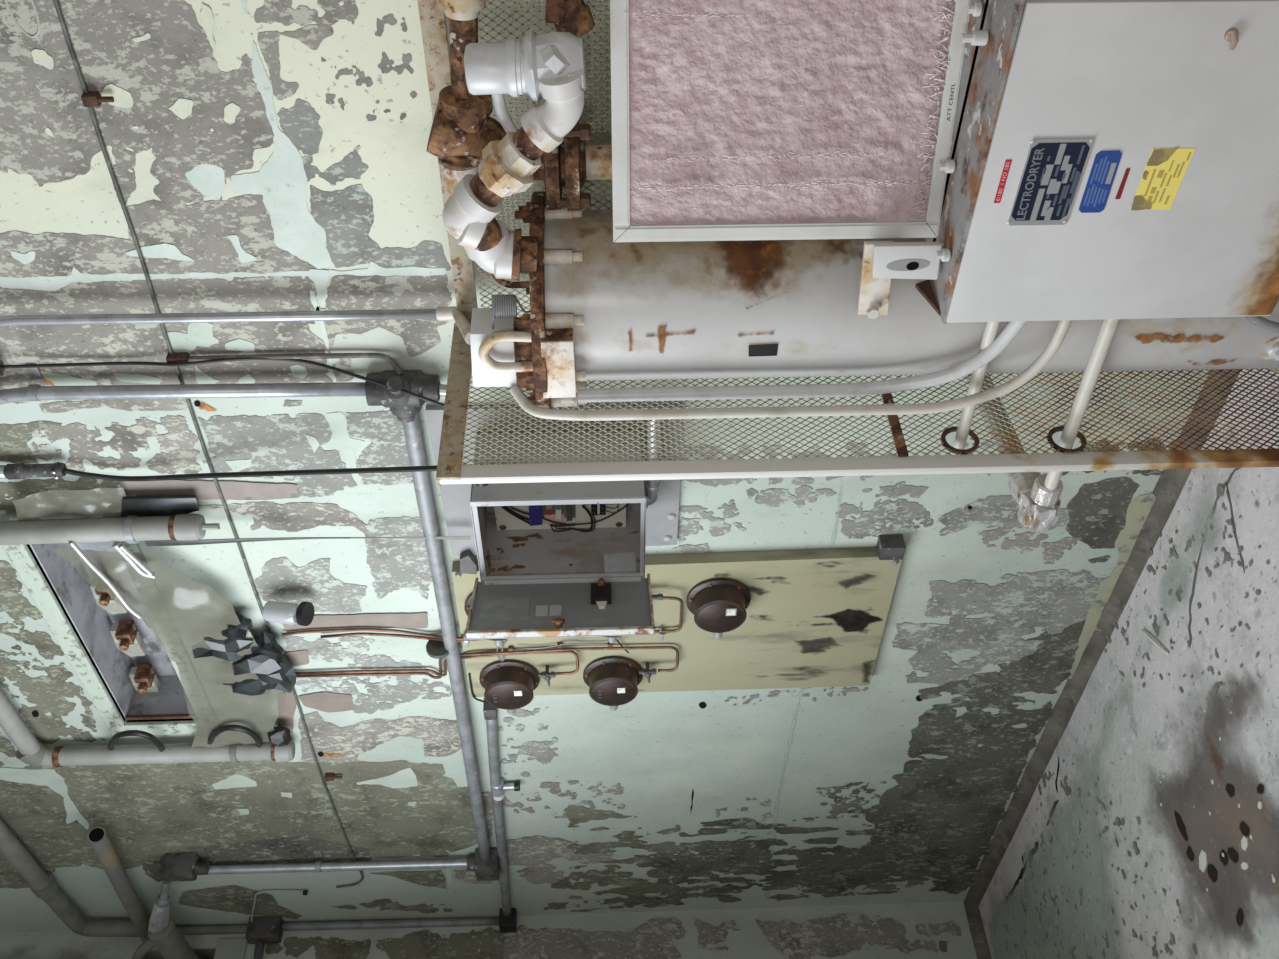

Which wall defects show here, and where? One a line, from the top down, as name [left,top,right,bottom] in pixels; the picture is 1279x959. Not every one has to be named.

peeling [0,0,452,613]
peeling [1082,438,1164,452]
peeling [0,469,1163,959]
water stain [1150,682,1279,943]